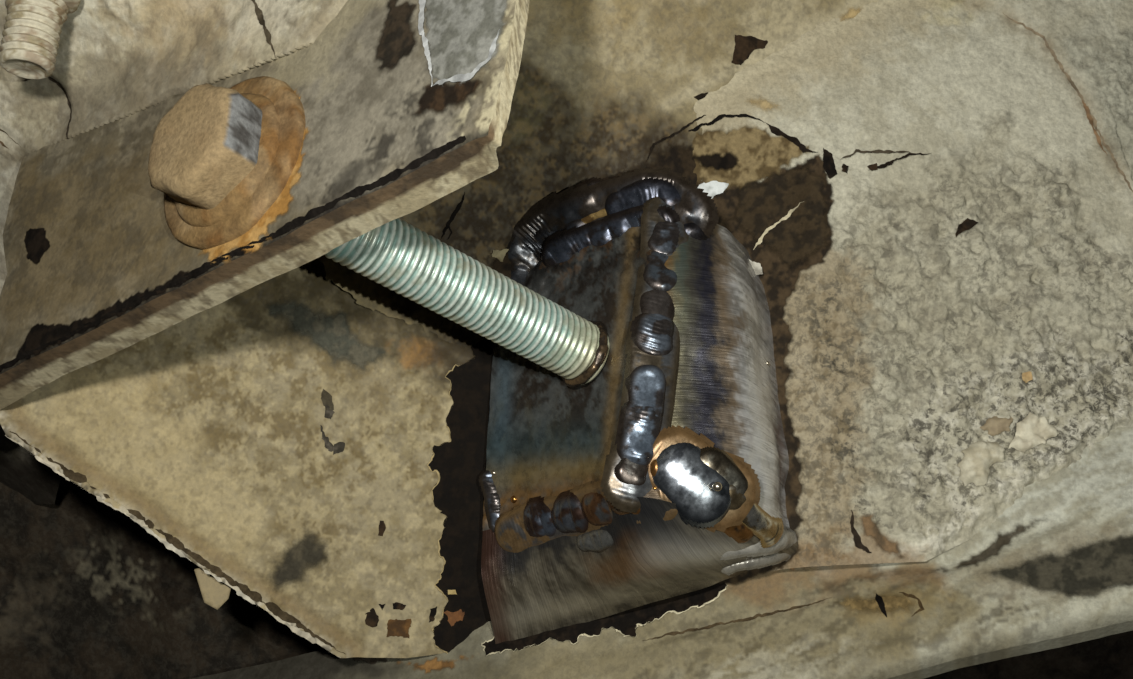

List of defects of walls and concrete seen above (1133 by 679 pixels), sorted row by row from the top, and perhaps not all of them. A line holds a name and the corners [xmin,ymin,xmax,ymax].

crack [1003,13,1133,192]
rust [203,128,308,261]
crack [646,114,931,173]
peeling [823,148,837,179]
peeling [492,249,509,262]
peeling [749,259,763,275]
peeling [320,389,345,455]
peeling [427,336,493,654]
leakage [273,534,327,588]
leakage [937,525,1133,596]
peeling [365,602,406,627]
peeling [481,583,727,656]